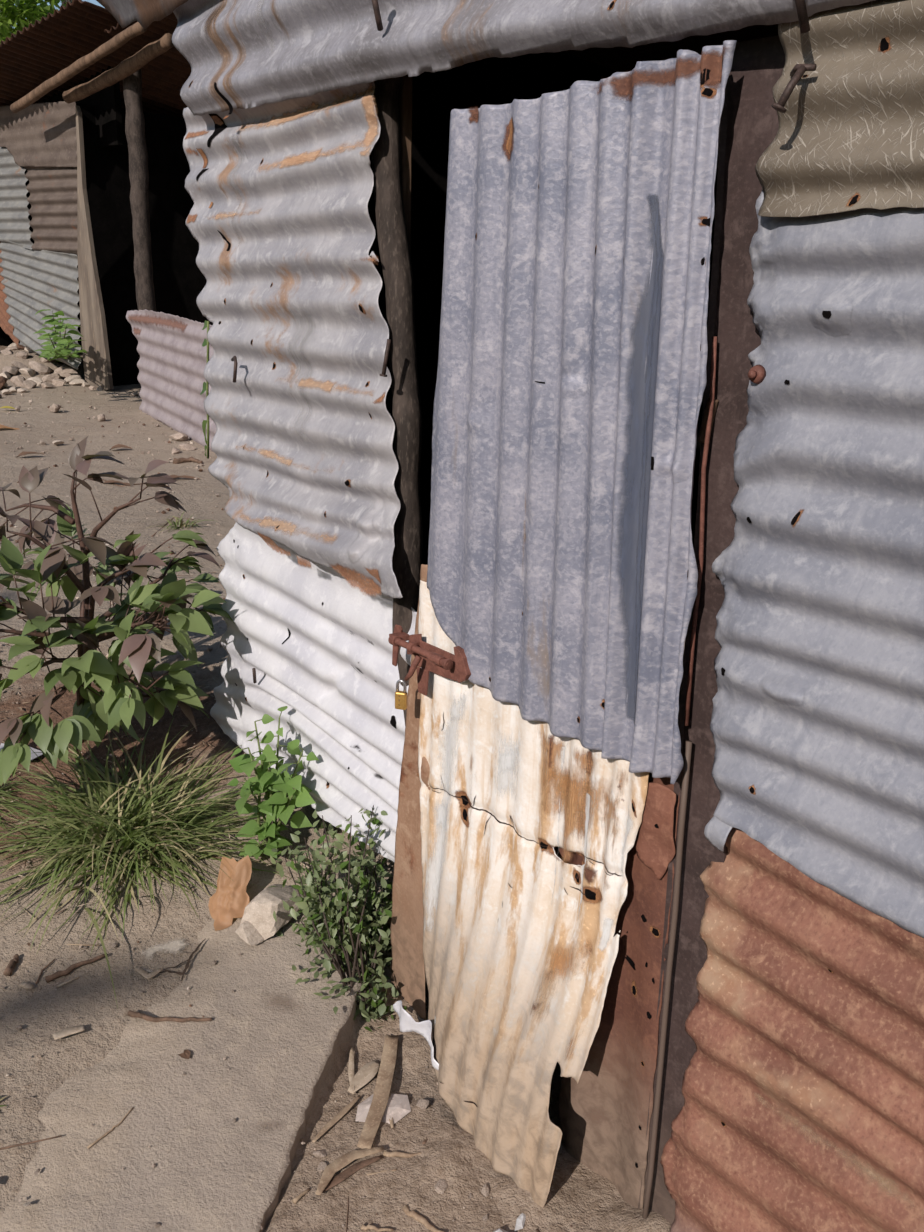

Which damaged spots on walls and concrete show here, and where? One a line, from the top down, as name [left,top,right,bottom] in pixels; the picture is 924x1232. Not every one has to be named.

corrosion [598,48,724,99]
corrosion [185,131,209,155]
corrosion [240,85,378,169]
corrosion [298,379,370,392]
corrosion [455,791,471,827]
corrosion [538,735,637,904]
corrosion [533,950,573,1015]